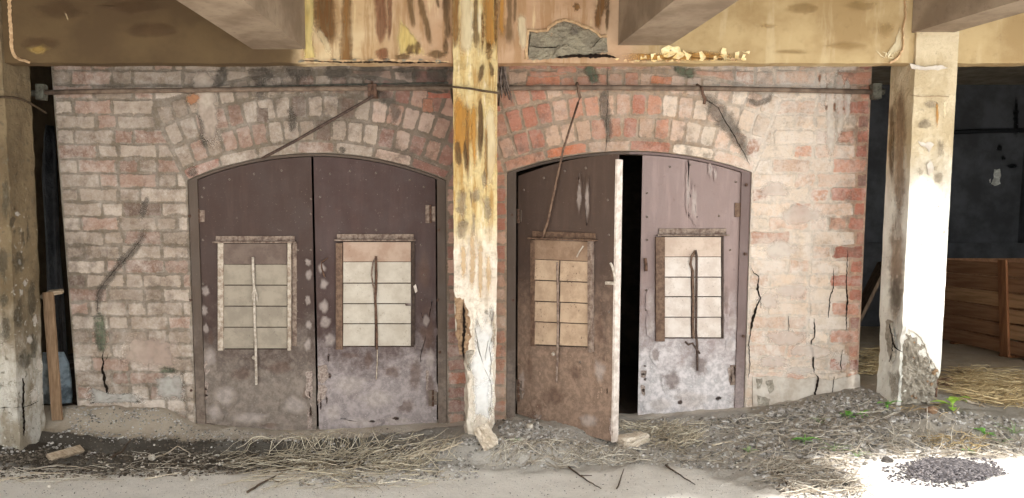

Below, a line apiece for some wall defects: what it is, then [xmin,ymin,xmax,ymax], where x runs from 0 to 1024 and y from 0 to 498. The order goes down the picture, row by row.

damp [396,0,450,80]
spalling [524,18,750,63]
crack [707,96,771,164]
damp [889,97,904,316]
crack [748,270,762,378]
crack [788,252,849,395]
crack [3,378,38,436]
crack [100,352,108,394]
peeling [454,297,499,453]
spalling [885,319,944,417]
spalling [85,444,235,485]